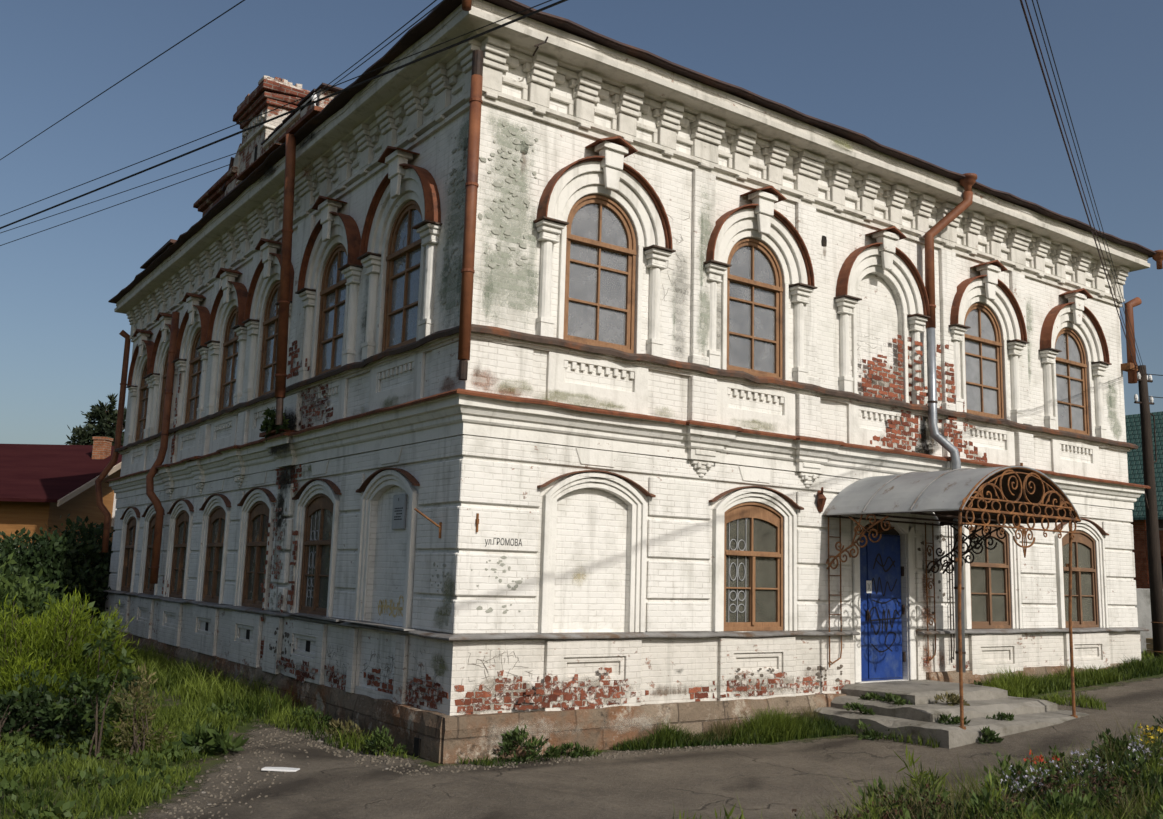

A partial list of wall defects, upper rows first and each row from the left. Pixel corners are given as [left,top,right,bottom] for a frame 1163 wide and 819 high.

flaking render [287,340,310,379]
flaking render [299,384,333,429]
flaking render [862,334,987,463]
flaking render [260,464,346,690]
flaking render [363,667,649,715]
flaking render [689,665,850,702]